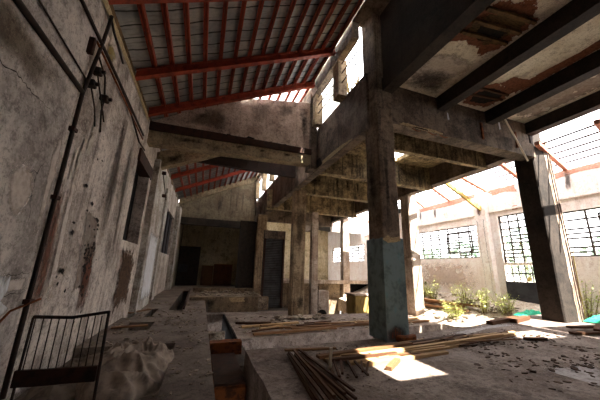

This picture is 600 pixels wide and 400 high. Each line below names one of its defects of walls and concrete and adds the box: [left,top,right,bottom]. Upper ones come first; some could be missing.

crack [0,59,53,113]
damp [408,54,469,91]
flaking render [503,72,537,94]
peeling [516,74,600,118]
rust [76,250,94,309]
flaking render [112,247,134,314]